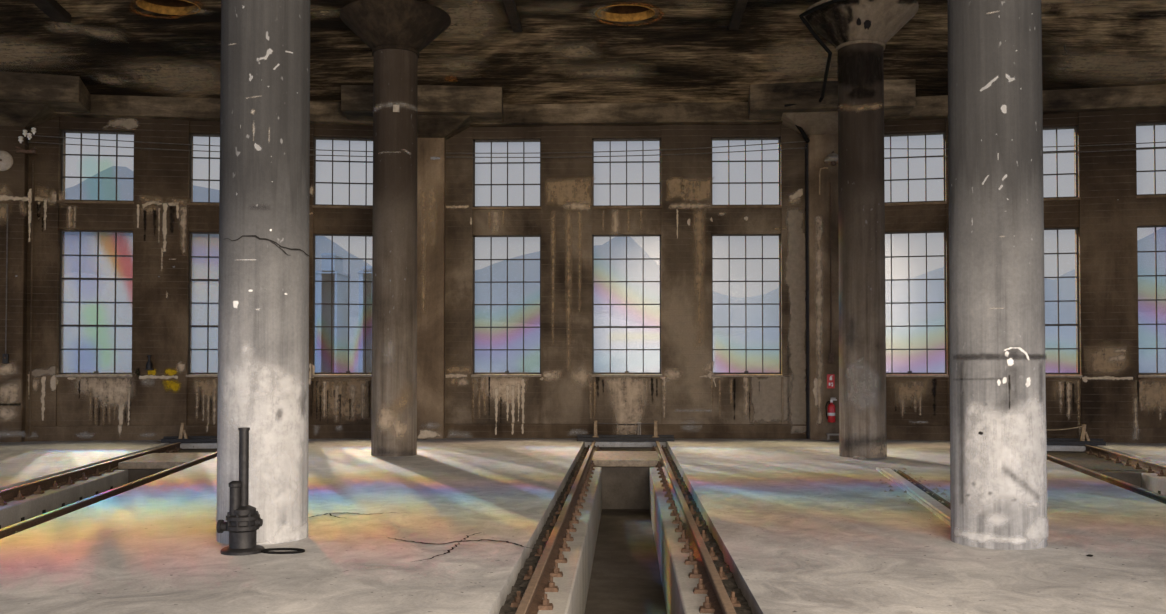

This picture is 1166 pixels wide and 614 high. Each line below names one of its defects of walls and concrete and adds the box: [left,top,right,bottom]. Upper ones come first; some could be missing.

water stain [0,187,76,242]
water stain [137,197,187,269]
crack [225,235,310,257]
water stain [78,378,132,434]
water stain [196,365,370,506]
crack [308,512,529,562]